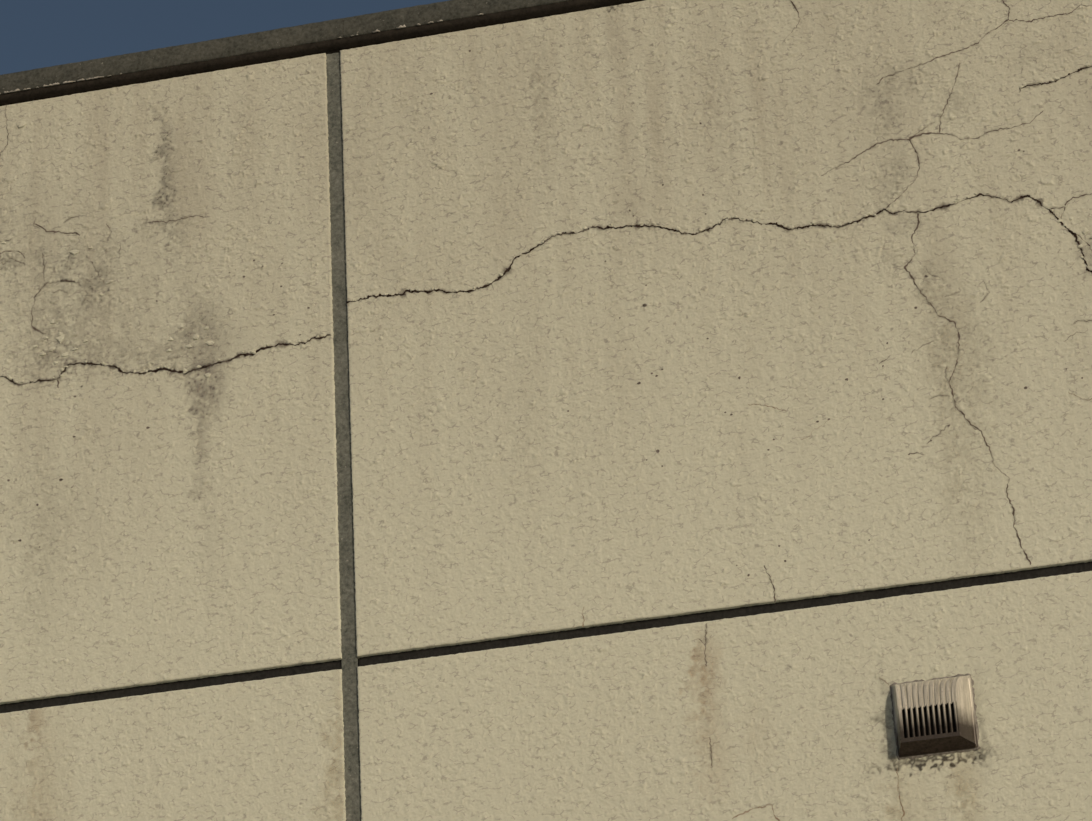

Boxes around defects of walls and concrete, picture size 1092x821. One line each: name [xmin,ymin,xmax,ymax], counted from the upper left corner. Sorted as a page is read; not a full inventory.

crack [0,216,105,340]
crack [346,0,1092,565]
crack [1,334,330,388]